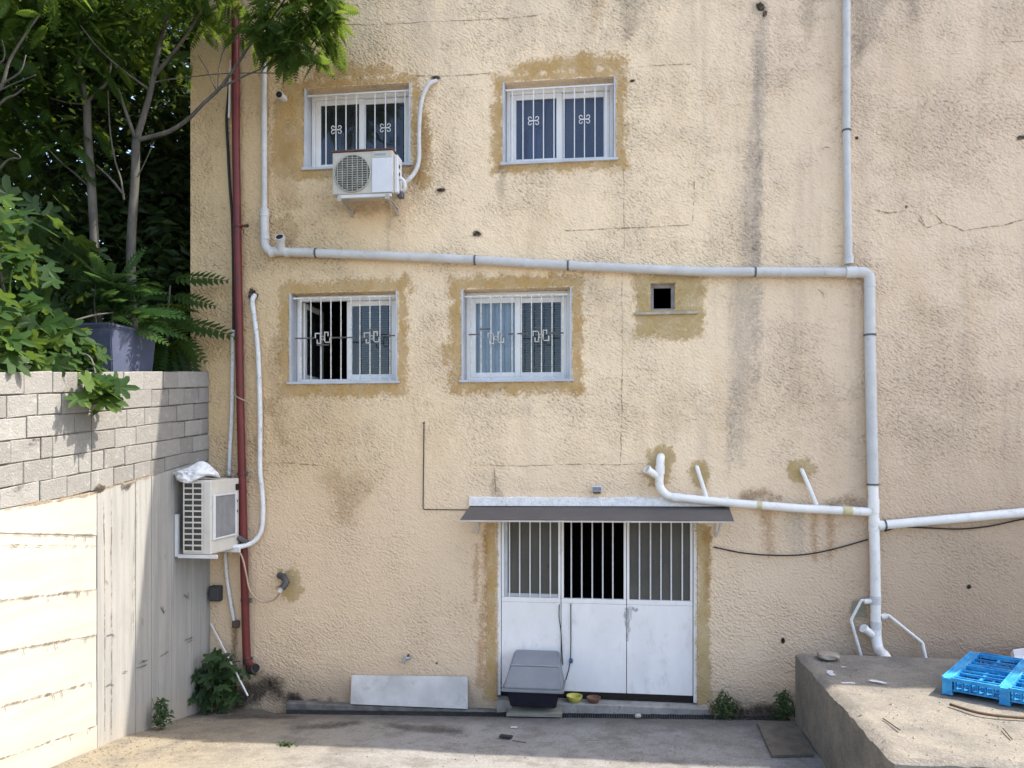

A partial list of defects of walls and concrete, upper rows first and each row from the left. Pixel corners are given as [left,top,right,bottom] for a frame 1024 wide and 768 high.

crack [878,210,1021,236]
damp [223,677,357,728]